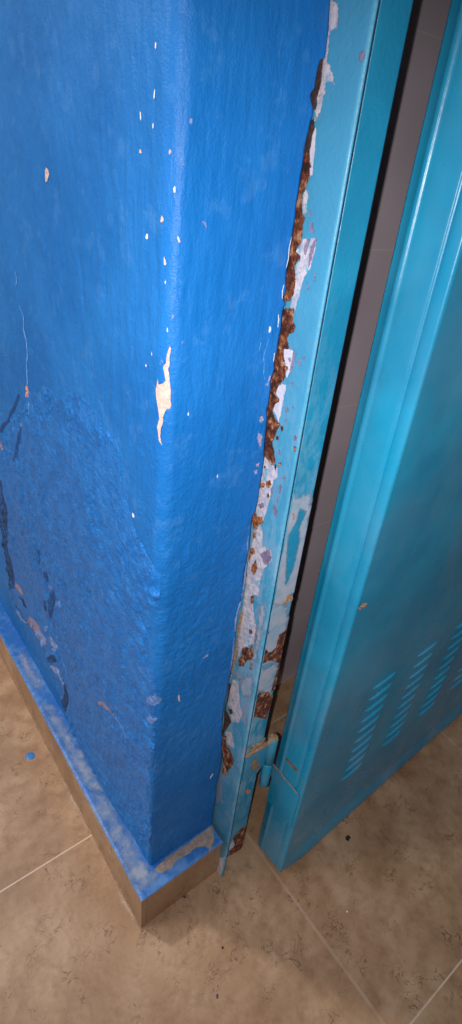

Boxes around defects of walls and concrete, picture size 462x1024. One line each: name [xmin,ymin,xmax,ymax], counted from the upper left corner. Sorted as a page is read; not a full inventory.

peeling [309,0,339,176]
corrosion [264,59,323,468]
peeling [282,189,317,311]
spalling [145,341,183,443]
peeling [225,349,311,749]
corrosion [222,512,287,775]
peeling [44,706,225,885]
corrosion [229,826,246,856]